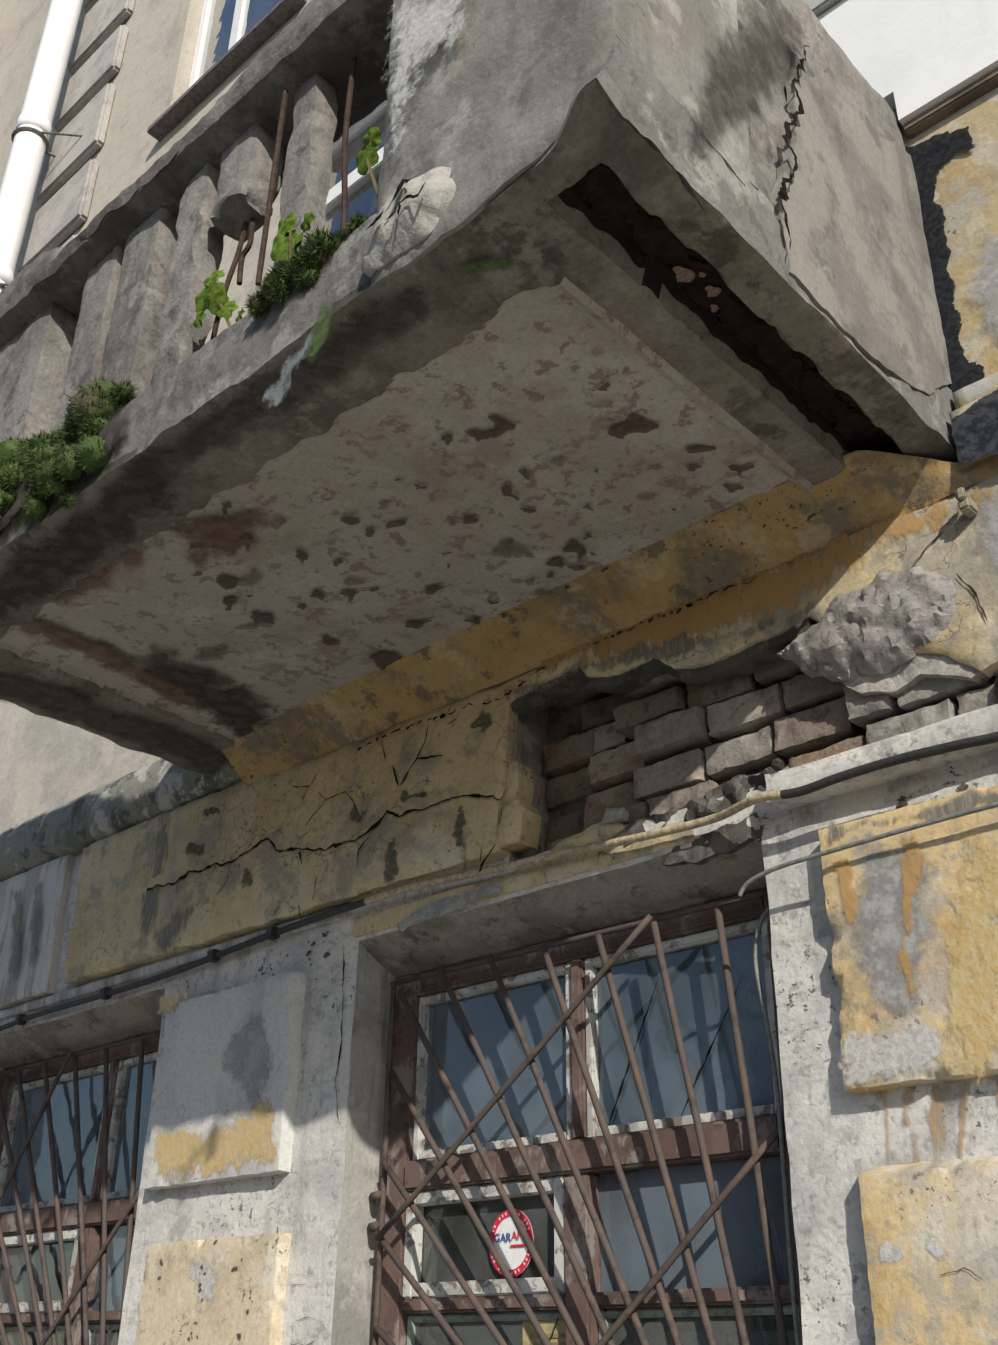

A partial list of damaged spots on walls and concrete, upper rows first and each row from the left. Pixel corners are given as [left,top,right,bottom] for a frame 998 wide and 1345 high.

peeling [441,415,516,445]
peeling [608,415,659,439]
peeling [686,446,717,472]
water stain [0,289,430,737]
peeling [527,534,608,595]
peeling [193,568,275,629]
water stain [505,603,814,699]
water stain [0,676,227,774]
water stain [471,710,492,732]
spalling [511,617,998,856]
crack [147,666,545,919]
spalling [663,812,763,867]